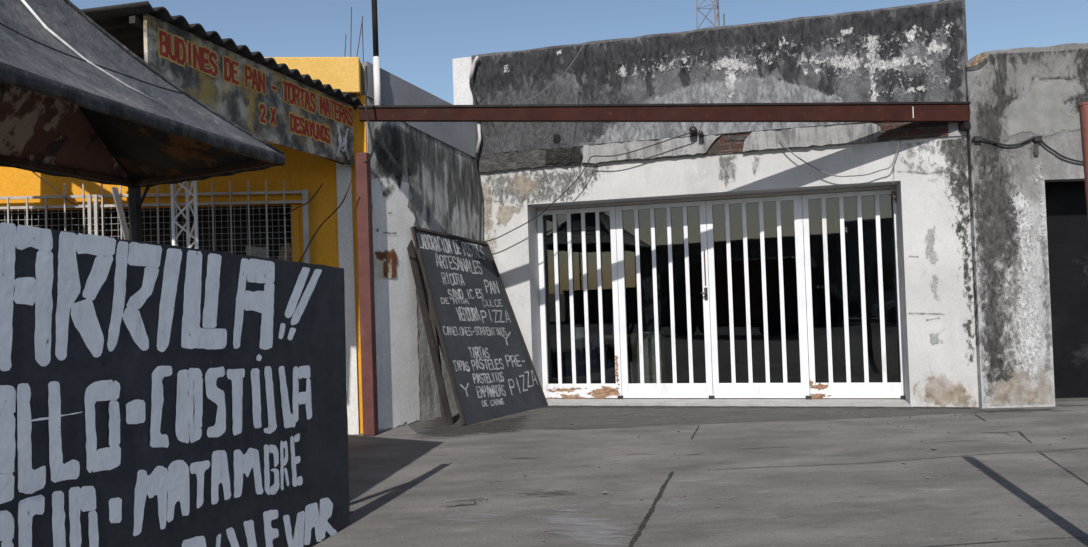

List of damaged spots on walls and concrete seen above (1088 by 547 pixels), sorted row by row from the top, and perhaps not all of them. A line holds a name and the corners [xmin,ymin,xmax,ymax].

spalling [703,133,756,155]
spalling [872,122,949,142]
leakage [374,122,603,255]
peeling [496,205,521,226]
leakage [473,1,1088,407]
rust [547,355,620,399]